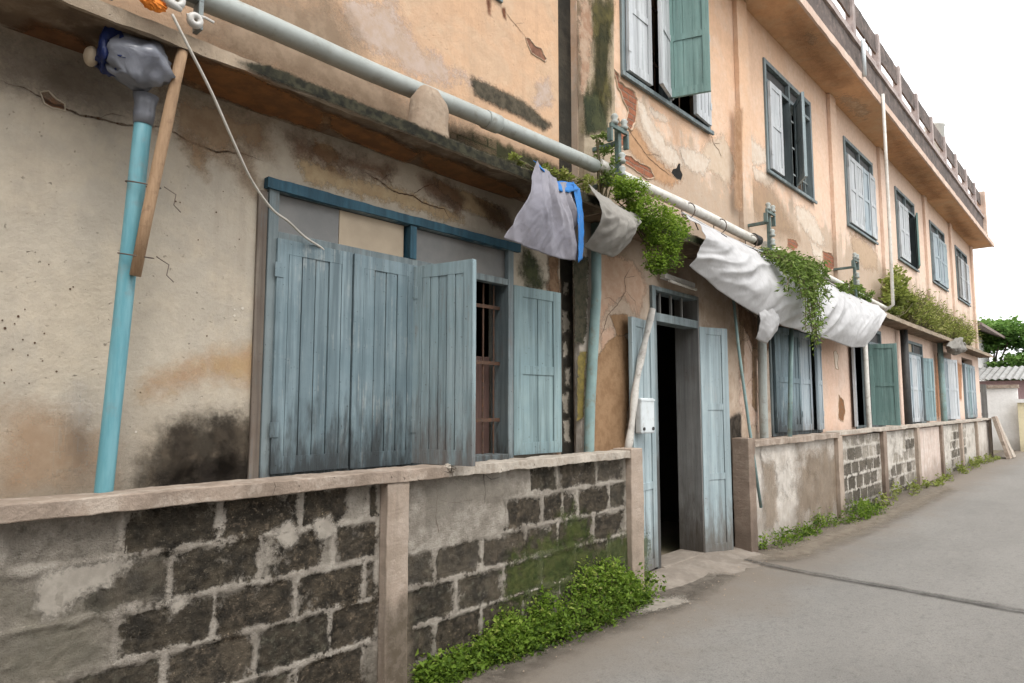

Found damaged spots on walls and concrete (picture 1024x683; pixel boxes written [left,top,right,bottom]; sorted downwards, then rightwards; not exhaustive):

crack [3,81,262,161]
leakage [246,0,356,53]
leakage [198,19,560,180]
leakage [580,0,614,135]
peeling [614,69,736,187]
leakage [580,191,600,206]
leakage [136,415,249,488]
leakage [76,452,626,683]